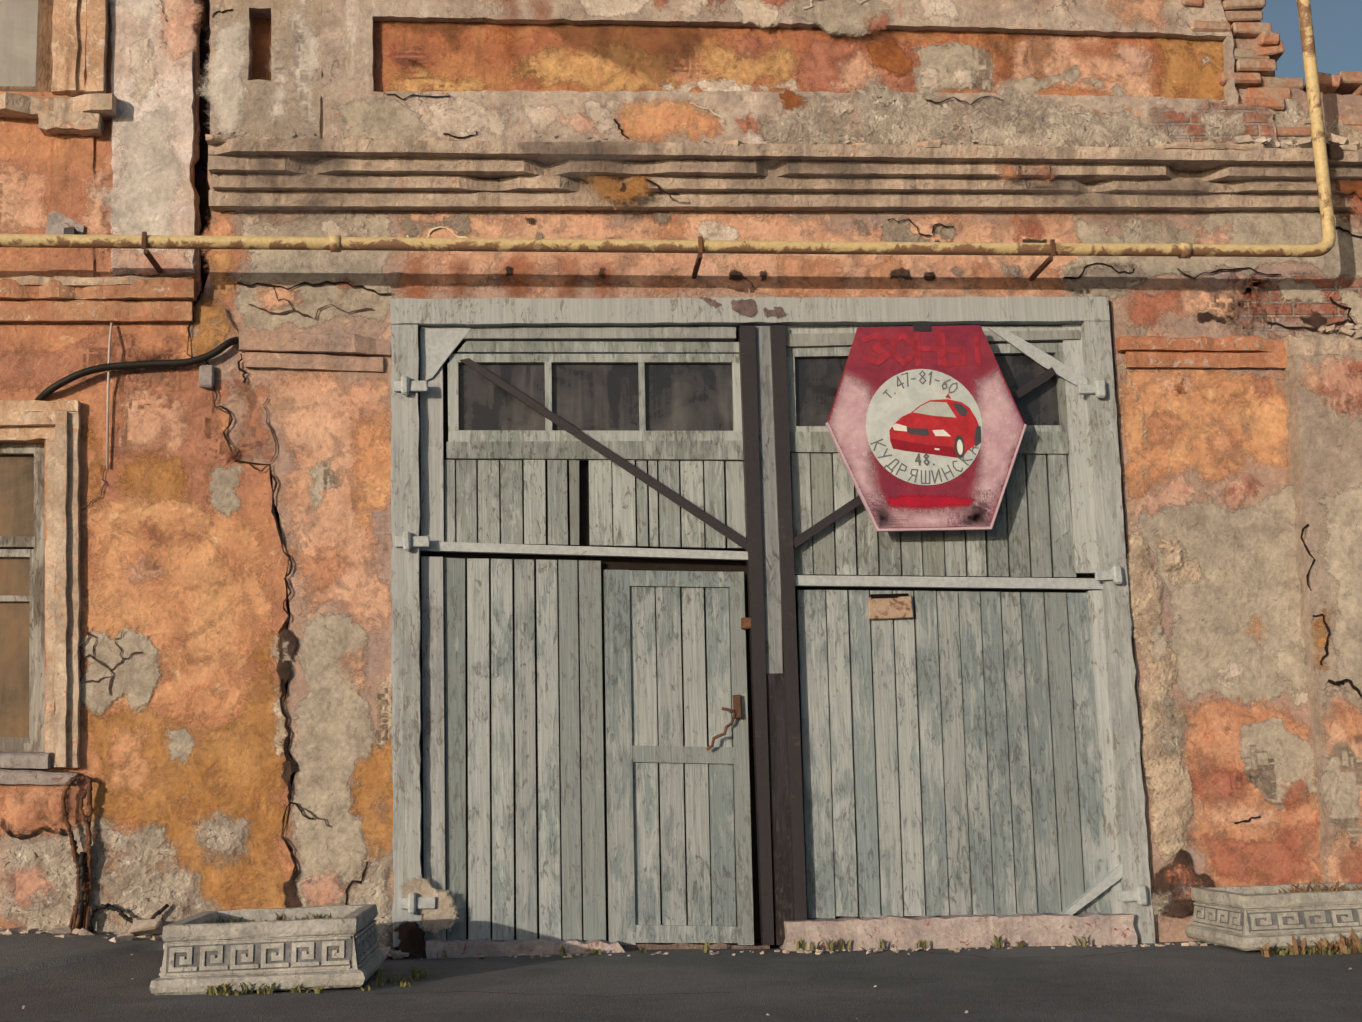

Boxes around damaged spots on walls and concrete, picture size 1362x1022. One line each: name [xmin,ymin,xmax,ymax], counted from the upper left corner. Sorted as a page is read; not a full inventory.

spalling [578,0,891,93]
spalling [912,42,997,93]
peeling [205,94,780,146]
spalling [1147,98,1362,159]
peeling [699,256,845,318]
peeling [855,218,957,297]
peeling [951,179,1362,337]
crack [187,9,314,908]
crack [79,626,161,715]
flaking render [1125,469,1281,918]
crack [1336,678,1362,698]
flaking render [0,784,220,936]